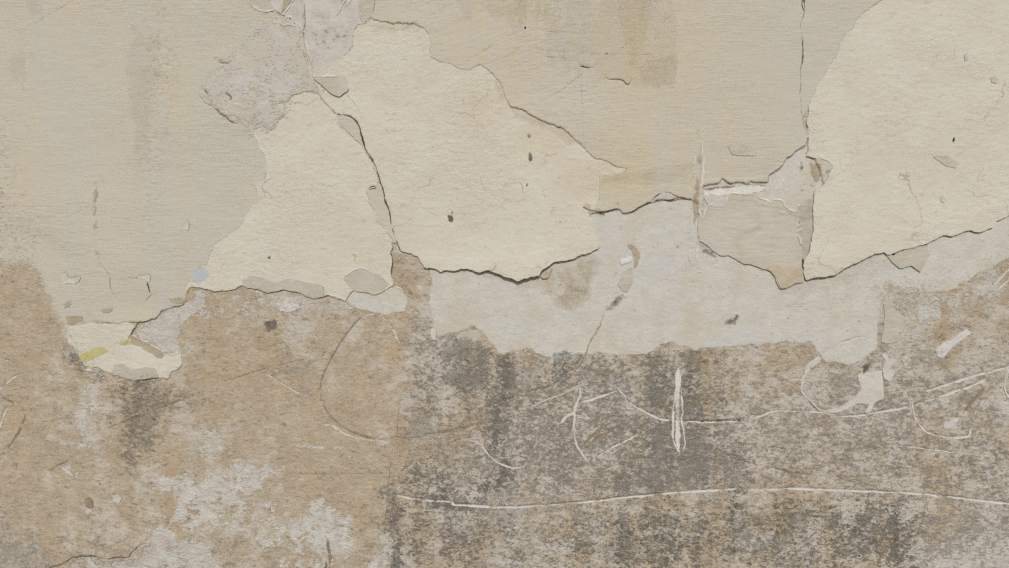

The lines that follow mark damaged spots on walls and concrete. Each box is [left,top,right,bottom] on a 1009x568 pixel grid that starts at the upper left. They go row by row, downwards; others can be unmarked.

peeling [63,0,1009,416]
spalling [63,384,100,451]
spalling [61,429,395,568]
spalling [478,534,577,568]
spalling [870,473,1009,568]